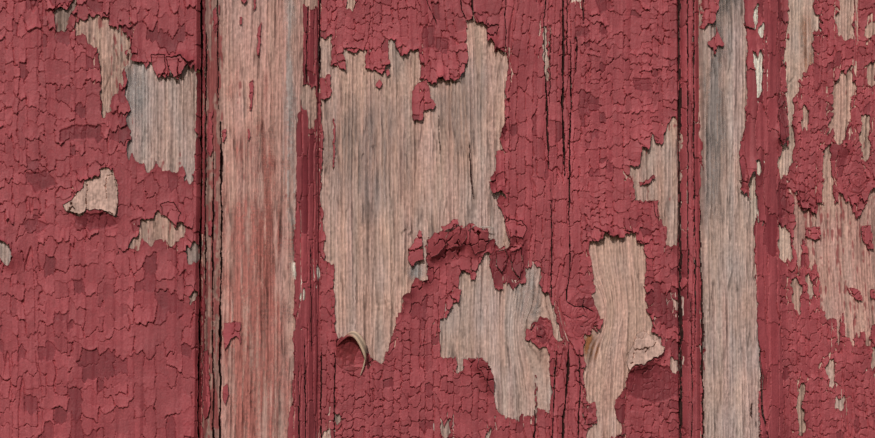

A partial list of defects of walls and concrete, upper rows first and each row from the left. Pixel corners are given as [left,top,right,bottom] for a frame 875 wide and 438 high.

crack [197,0,223,438]
crack [305,0,321,92]
crack [298,245,336,438]
peeling [46,0,688,438]
crack [467,145,475,199]
crack [533,0,596,438]
crack [677,0,705,438]
peeling [692,0,768,438]
crack [750,350,768,438]
peeling [792,376,811,438]
peeling [777,0,875,417]